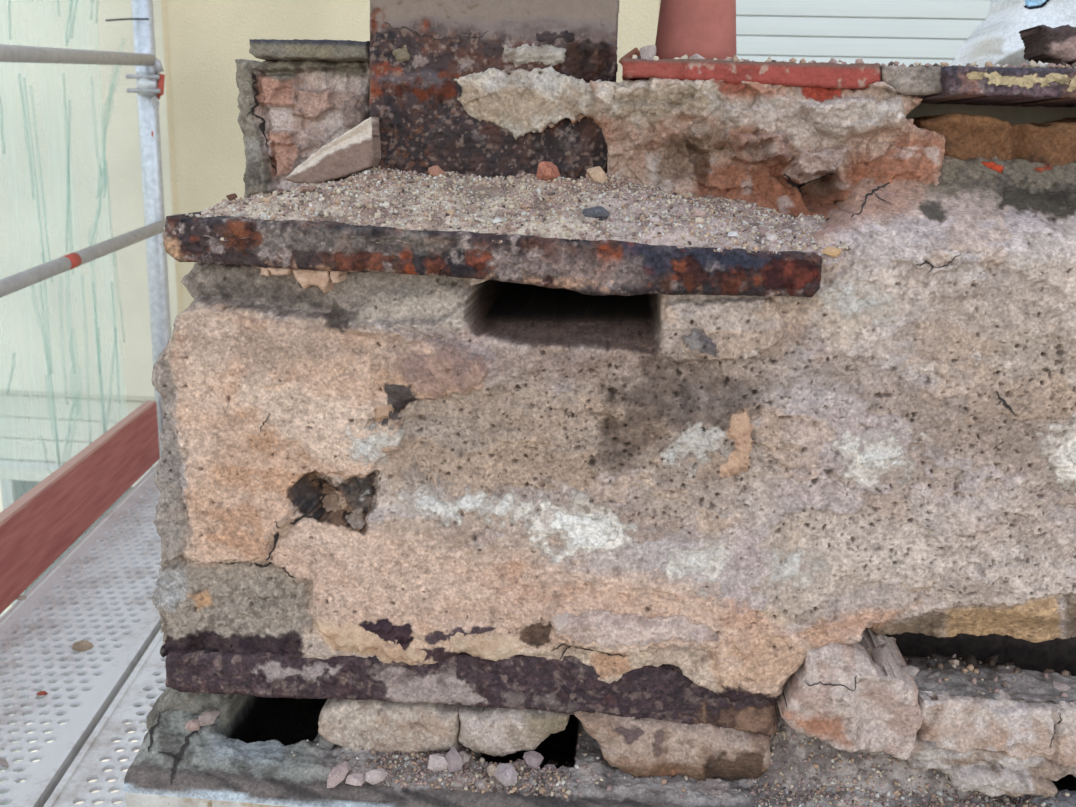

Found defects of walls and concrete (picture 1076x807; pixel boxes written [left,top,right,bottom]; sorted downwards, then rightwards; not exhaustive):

corrosion [552,39,611,82]
spalling [590,77,946,219]
crack [851,179,893,217]
corrosion [671,256,821,296]
peeling [320,490,366,529]
corrosion [160,631,303,661]
corrosion [359,618,495,662]
corrosion [718,687,775,703]
spalling [900,666,919,678]
spalling [1053,681,1071,692]
spalling [185,708,220,732]
crack [148,712,202,785]